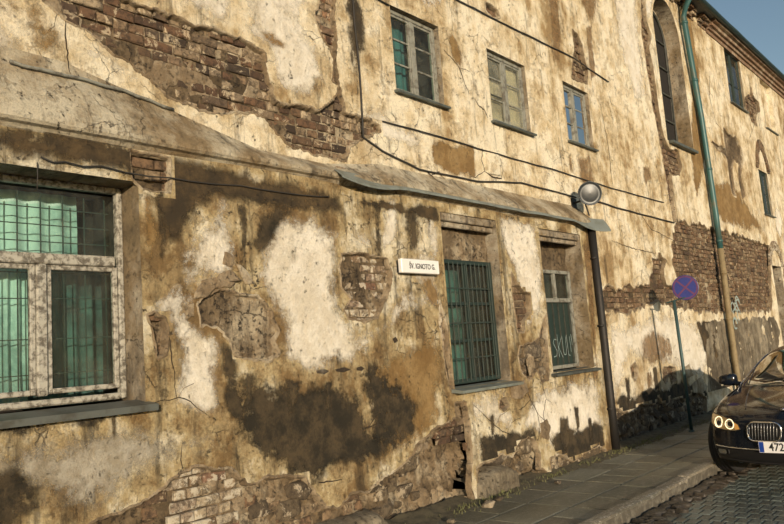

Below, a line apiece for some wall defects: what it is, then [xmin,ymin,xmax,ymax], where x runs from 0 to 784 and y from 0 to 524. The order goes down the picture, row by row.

spalling [42,0,382,169]
damp [346,0,365,68]
spalling [571,29,588,85]
spalling [603,0,784,317]
spalling [146,310,170,361]
crack [155,337,207,415]
spalling [184,252,281,363]
damp [222,335,440,483]
spalling [87,400,607,524]
spalling [338,252,393,324]
crack [473,384,554,446]
spalling [511,271,550,383]